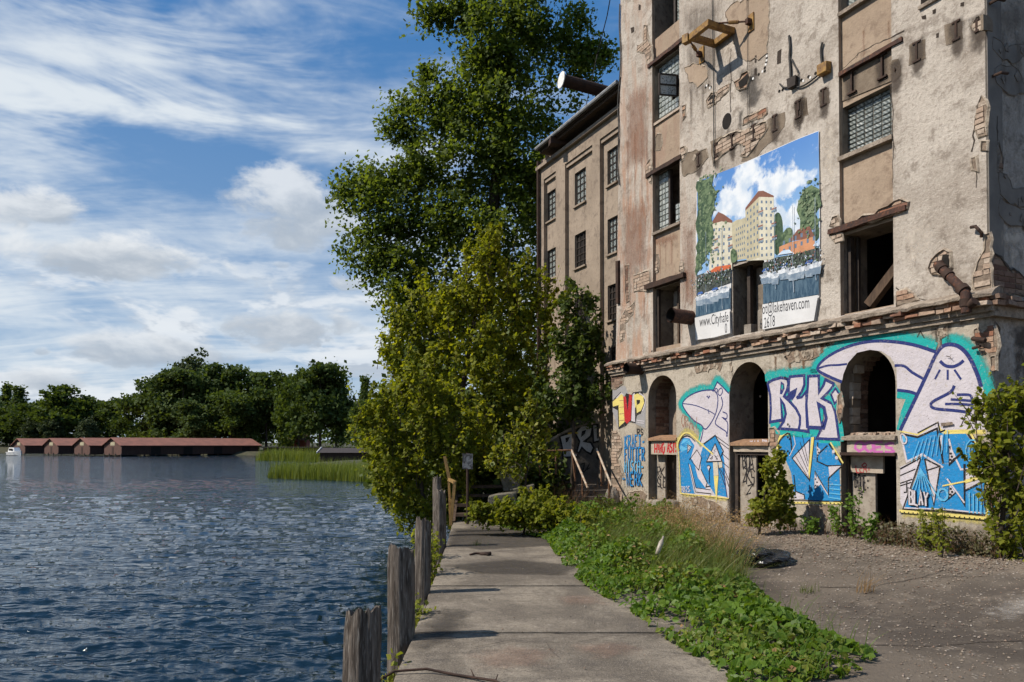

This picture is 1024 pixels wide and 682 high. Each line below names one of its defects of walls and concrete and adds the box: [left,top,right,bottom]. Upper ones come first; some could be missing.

peeling [684,0,781,109]
spalling [680,107,769,177]
peeling [970,95,1024,229]
spalling [619,254,660,343]
spalling [972,231,1024,297]
peeling [783,344,820,364]
spalling [935,320,1002,372]
spalling [611,430,647,508]